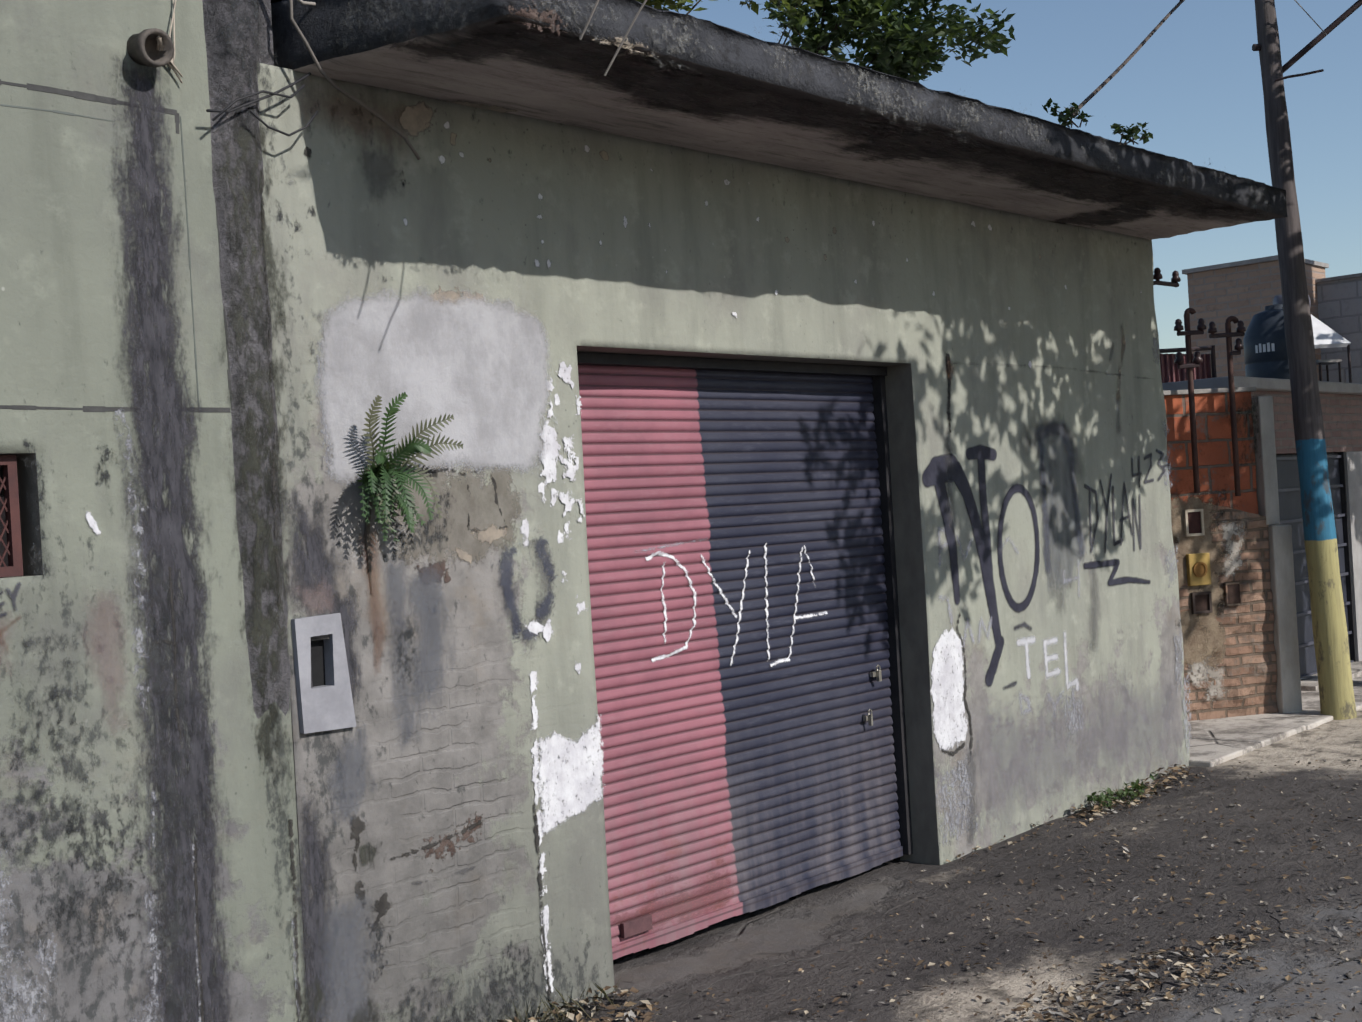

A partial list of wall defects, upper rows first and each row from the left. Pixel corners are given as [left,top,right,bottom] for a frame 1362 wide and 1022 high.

damp [390,28,1256,227]
damp [0,67,229,1022]
damp [215,0,361,783]
damp [388,566,441,736]
peeling [524,618,553,642]
peeling [538,362,585,543]
peeling [530,671,554,1002]